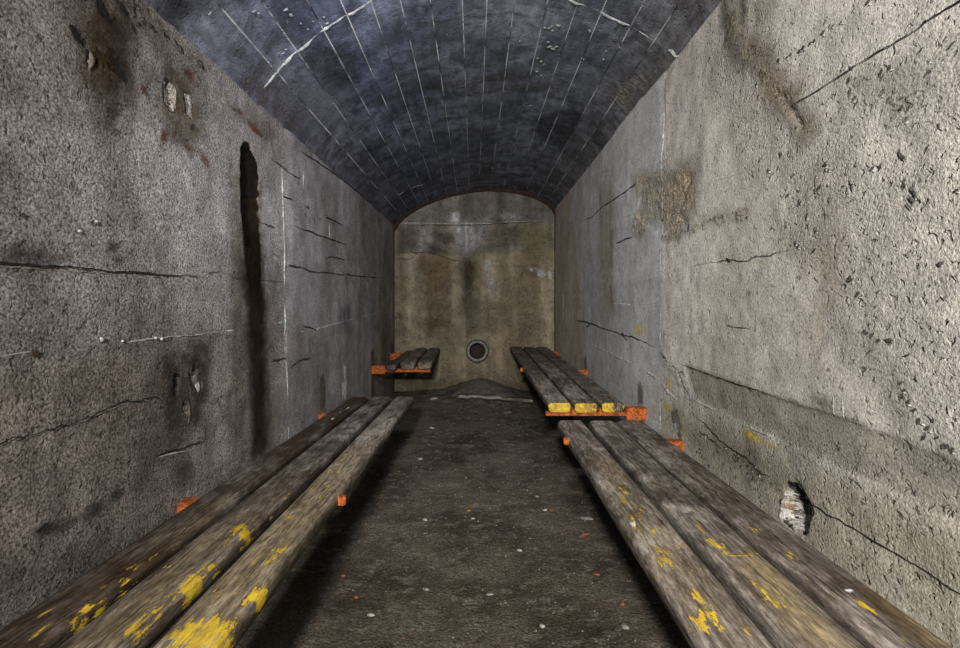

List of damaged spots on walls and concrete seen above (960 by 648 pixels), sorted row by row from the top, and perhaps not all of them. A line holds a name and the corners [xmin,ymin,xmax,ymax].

crack [792,0,960,105]
spalling [163,77,195,130]
crack [0,152,375,282]
leakage [234,141,270,457]
spalling [633,170,749,239]
crack [695,250,786,266]
spalling [188,358,203,392]
crack [577,320,863,426]
spalling [779,481,814,533]
crack [809,503,960,594]